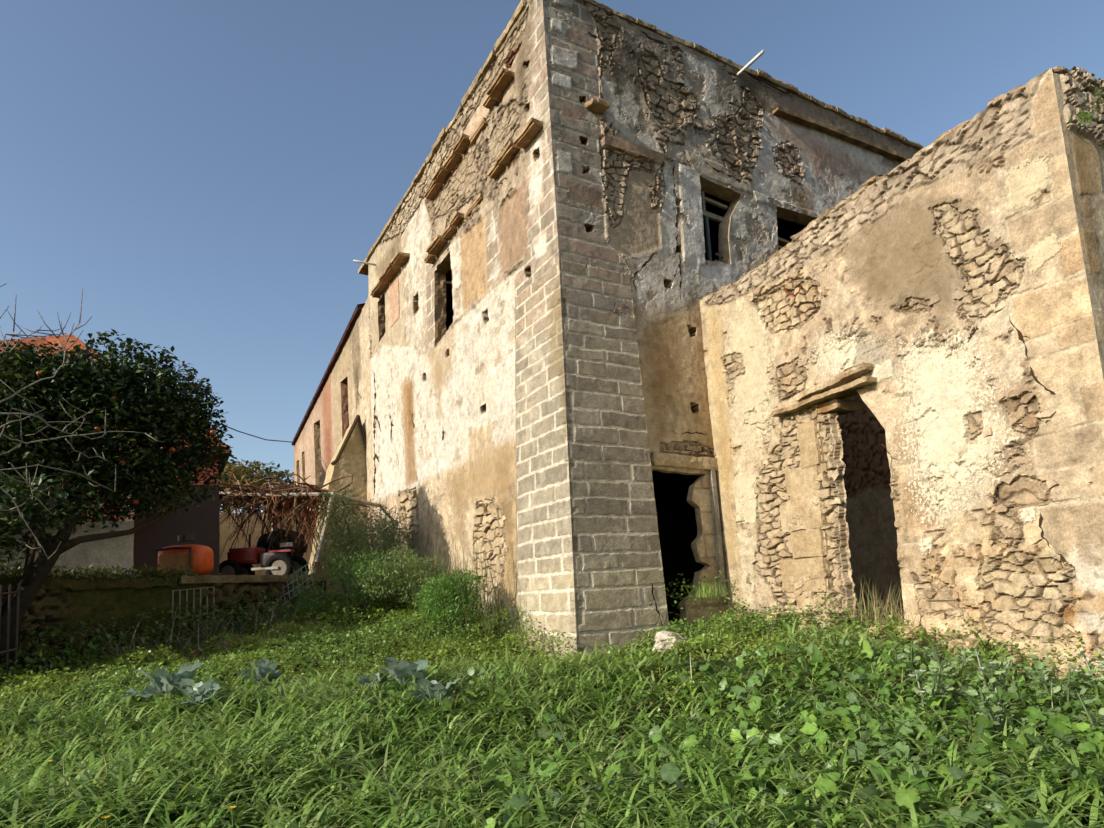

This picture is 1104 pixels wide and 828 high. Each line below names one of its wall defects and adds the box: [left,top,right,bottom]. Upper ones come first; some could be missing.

flaking render [380,10,530,244]
flaking render [594,18,625,70]
flaking render [637,56,700,126]
flaking render [714,87,806,186]
flaking render [583,149,667,228]
flaking render [1000,149,1059,224]
crack [956,321,985,366]
crack [1008,314,1056,434]
flaking render [722,204,1083,642]
flaking render [472,498,509,595]